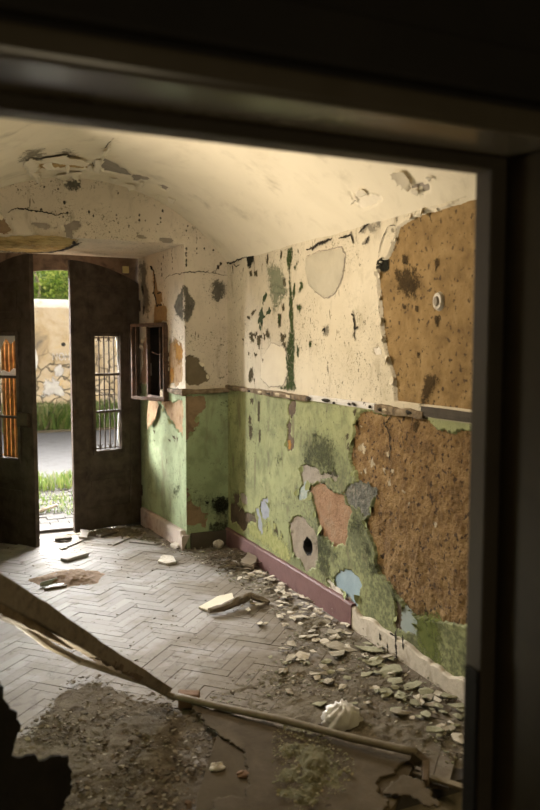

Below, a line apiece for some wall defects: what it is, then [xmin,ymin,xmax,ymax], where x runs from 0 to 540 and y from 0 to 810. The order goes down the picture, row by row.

peeling [23,155,149,191]
crack [8,207,68,216]
crack [150,256,255,307]
flaking render [147,337,210,442]
flaking render [230,200,476,636]
damp [191,495,228,531]
peeling [224,553,464,744]